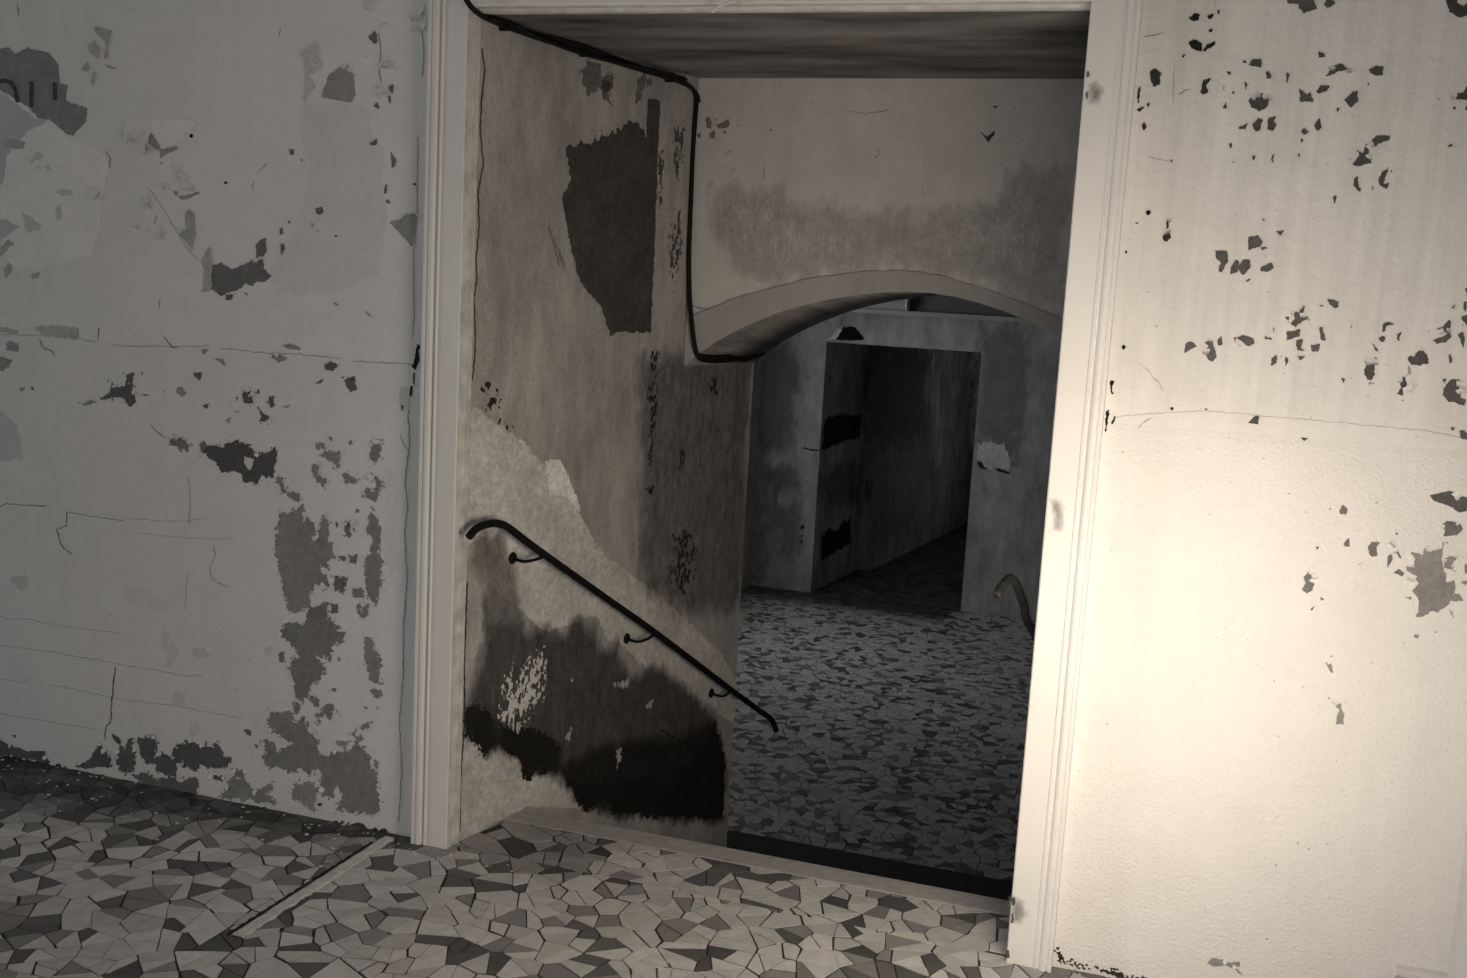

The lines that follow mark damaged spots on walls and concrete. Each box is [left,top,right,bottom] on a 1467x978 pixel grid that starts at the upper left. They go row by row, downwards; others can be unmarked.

peeling [1182,10,1220,58]
peeling [174,191,290,300]
peeling [562,73,661,336]
water stain [715,173,1060,296]
peeling [1215,219,1284,282]
peeling [1200,52,1384,163]
peeling [1353,135,1392,192]
peeling [1184,299,1339,366]
peeling [1364,288,1467,406]
peeling [76,387,387,817]
peeling [1359,490,1467,638]
water stain [462,532,728,822]